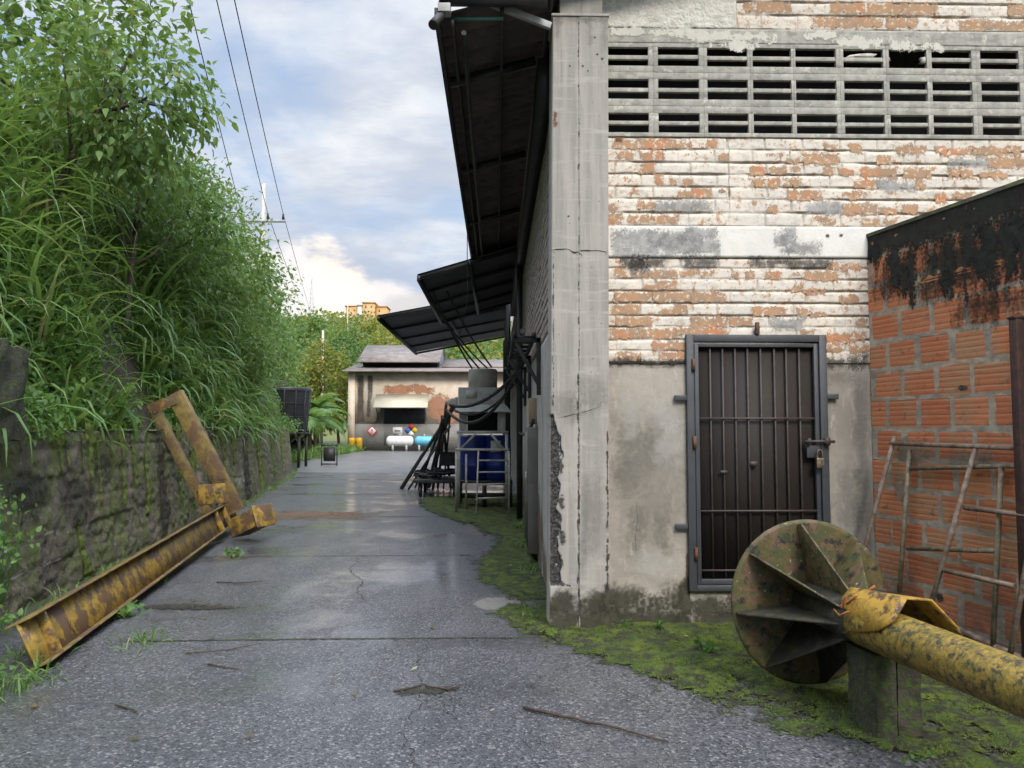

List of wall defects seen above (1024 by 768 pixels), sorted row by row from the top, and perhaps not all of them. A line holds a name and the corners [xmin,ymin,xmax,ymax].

peeling [610,26,779,53]
peeling [803,0,947,53]
peeling [611,137,731,200]
peeling [748,142,1024,237]
leakage [876,178,917,192]
leakage [866,183,1024,324]
peeling [609,261,869,362]
spalling [550,257,581,600]
leakage [3,435,112,522]
leakage [130,426,169,533]
leakage [275,511,384,520]
leakage [536,496,734,634]